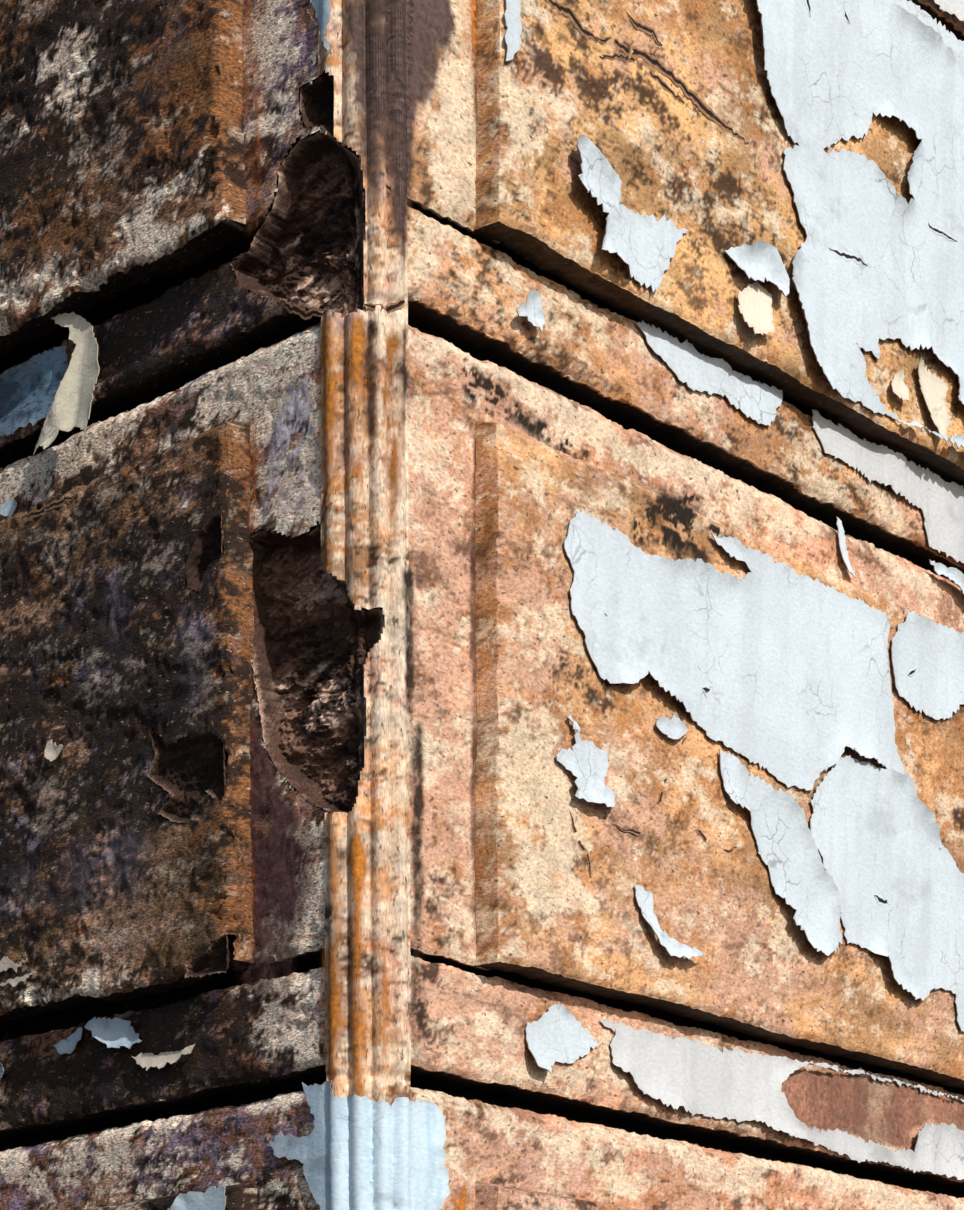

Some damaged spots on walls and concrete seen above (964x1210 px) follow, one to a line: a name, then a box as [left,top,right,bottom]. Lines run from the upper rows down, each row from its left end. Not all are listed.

damp [348,0,454,248]
crack [545,0,749,144]
peeling [724,0,964,448]
rust [321,320,336,482]
rust [351,317,367,396]
rust [383,336,398,516]
peeling [812,409,964,594]
spalling [250,523,384,813]
peeling [556,509,964,1032]
rust [323,831,366,1097]
peeling [269,1080,450,1210]
peeling [525,1004,964,1180]